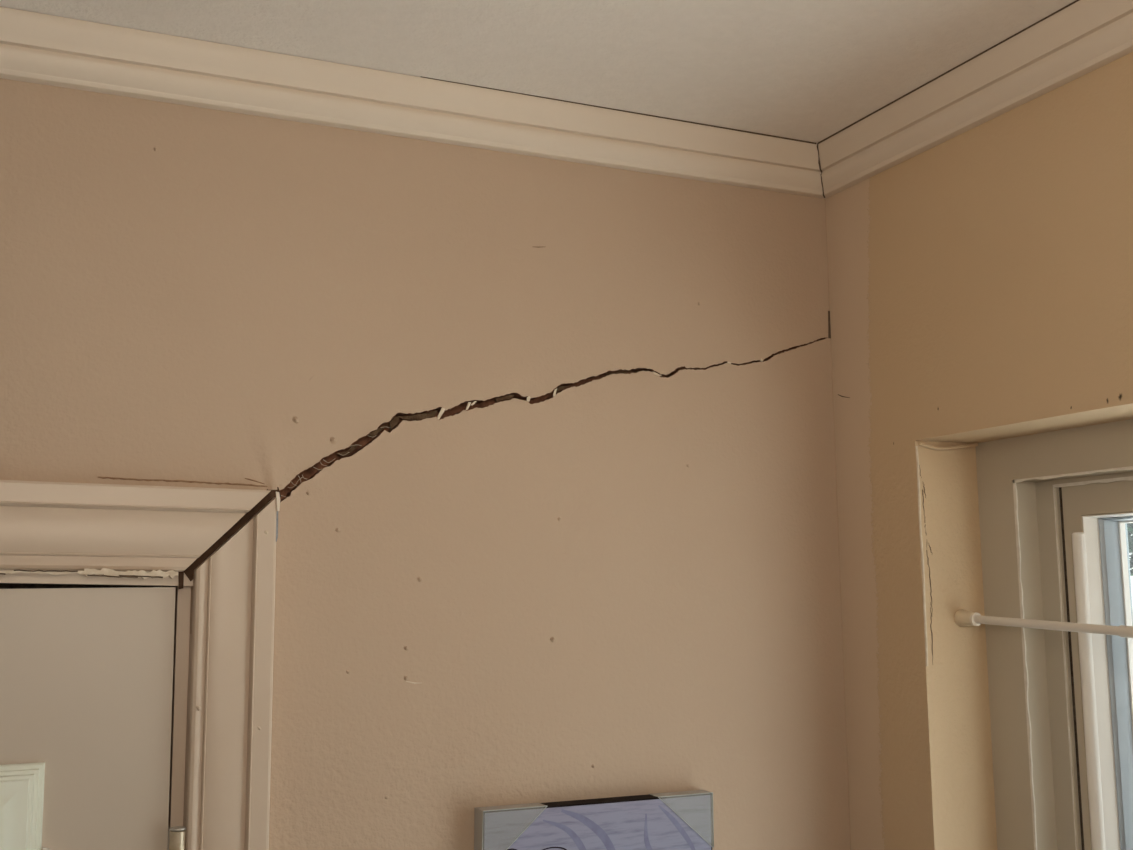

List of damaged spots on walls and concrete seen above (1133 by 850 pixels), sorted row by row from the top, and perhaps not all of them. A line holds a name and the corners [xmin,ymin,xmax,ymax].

crack [98,311,831,502]